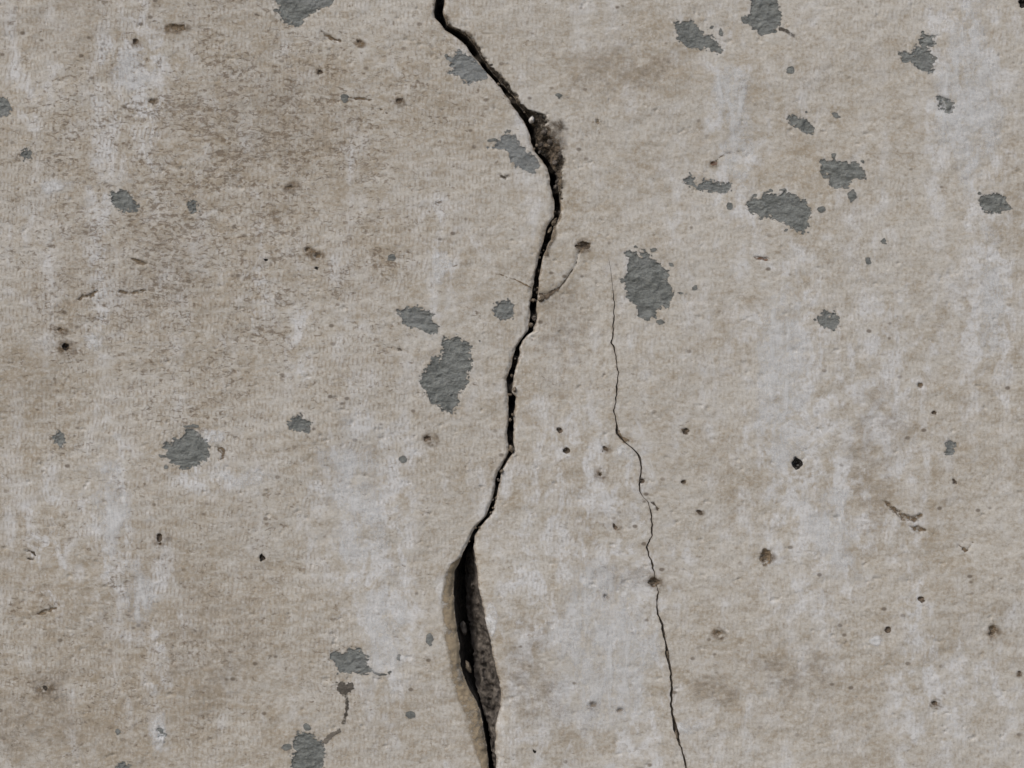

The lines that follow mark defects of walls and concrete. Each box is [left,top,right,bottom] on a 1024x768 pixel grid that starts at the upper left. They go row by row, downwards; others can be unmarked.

peeling [273,0,334,27]
peeling [673,19,723,55]
peeling [741,0,794,37]
peeling [897,31,938,74]
peeling [819,153,868,203]
peeling [746,188,826,235]
peeling [620,245,697,325]
peeling [396,304,481,414]
crack [434,0,578,768]
peeling [159,424,225,470]
crack [609,262,687,768]
peeling [281,646,401,768]